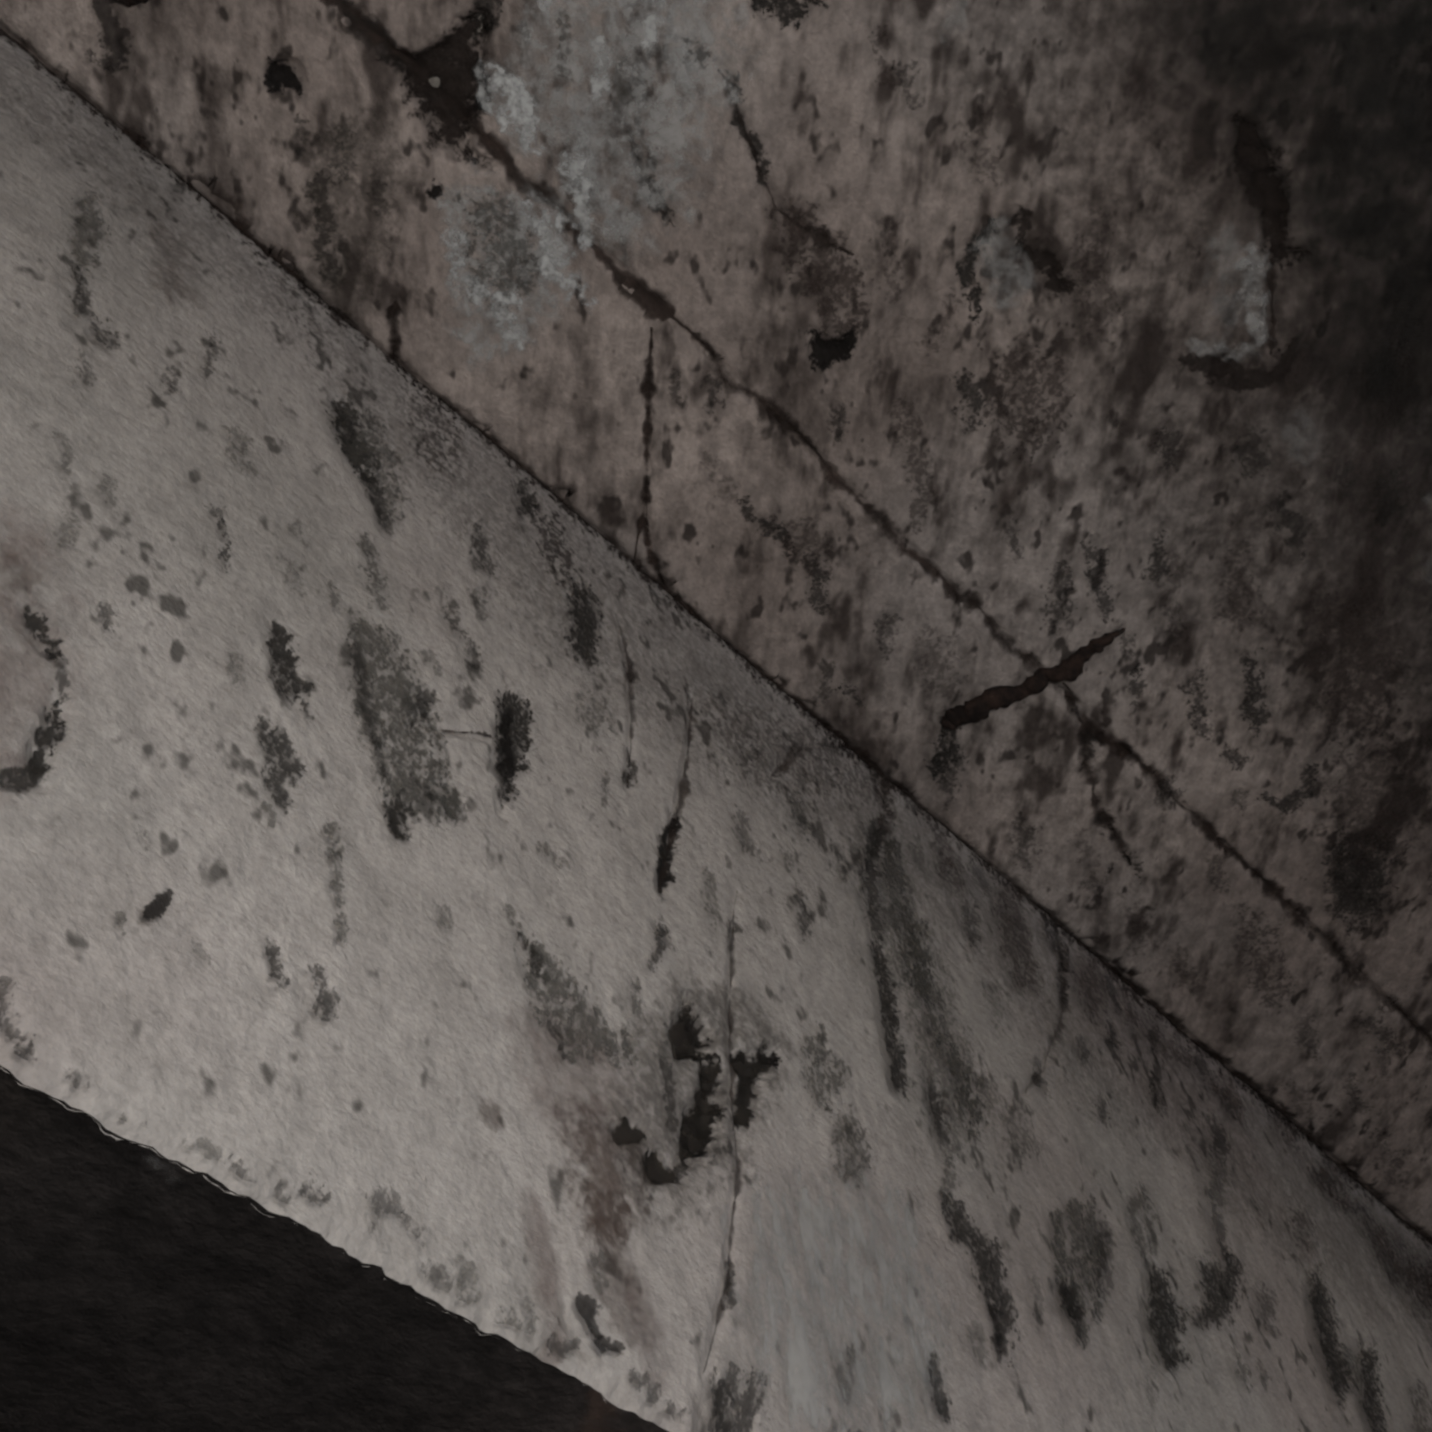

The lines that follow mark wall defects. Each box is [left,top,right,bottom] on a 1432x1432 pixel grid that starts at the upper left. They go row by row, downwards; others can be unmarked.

crack [0,28,351,324]
damp [28,51,378,350]
damp [439,0,734,359]
damp [116,888,174,935]
damp [254,715,306,814]
damp [266,620,315,719]
damp [340,399,409,611]
crack [320,0,1432,1046]
damp [382,352,1431,1260]
spalling [612,1003,782,1185]
crack [1019,887,1432,1244]
damp [988,1302,1008,1363]